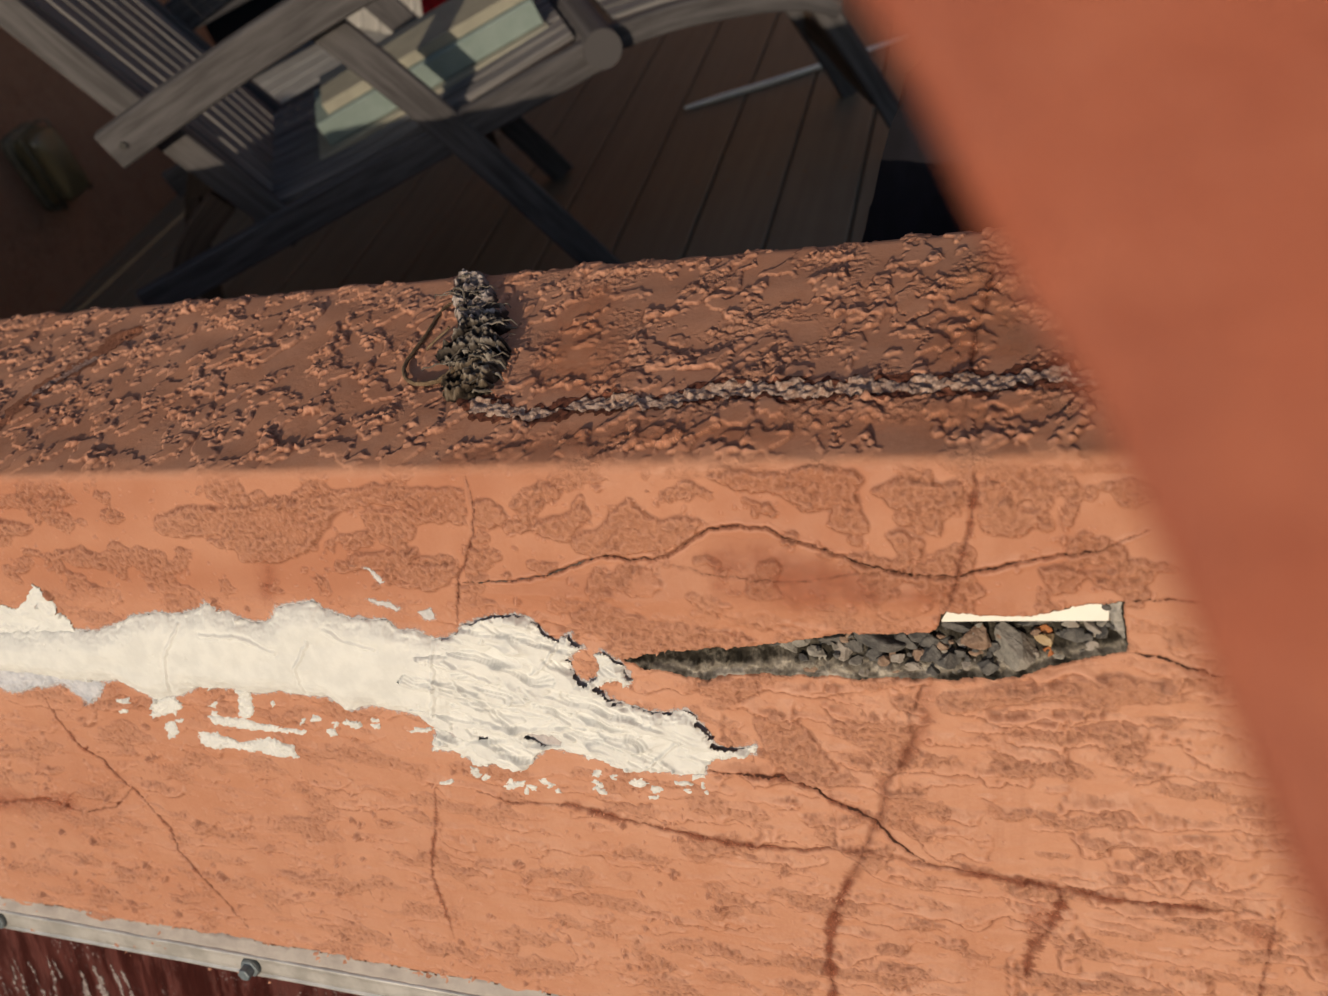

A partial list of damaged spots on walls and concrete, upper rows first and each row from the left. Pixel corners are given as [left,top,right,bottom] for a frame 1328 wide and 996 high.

crack [456,342,1081,428]
crack [457,555,654,598]
crack [684,500,1094,578]
spalling [624,601,1129,681]
crack [713,771,914,855]
crack [824,880,851,996]